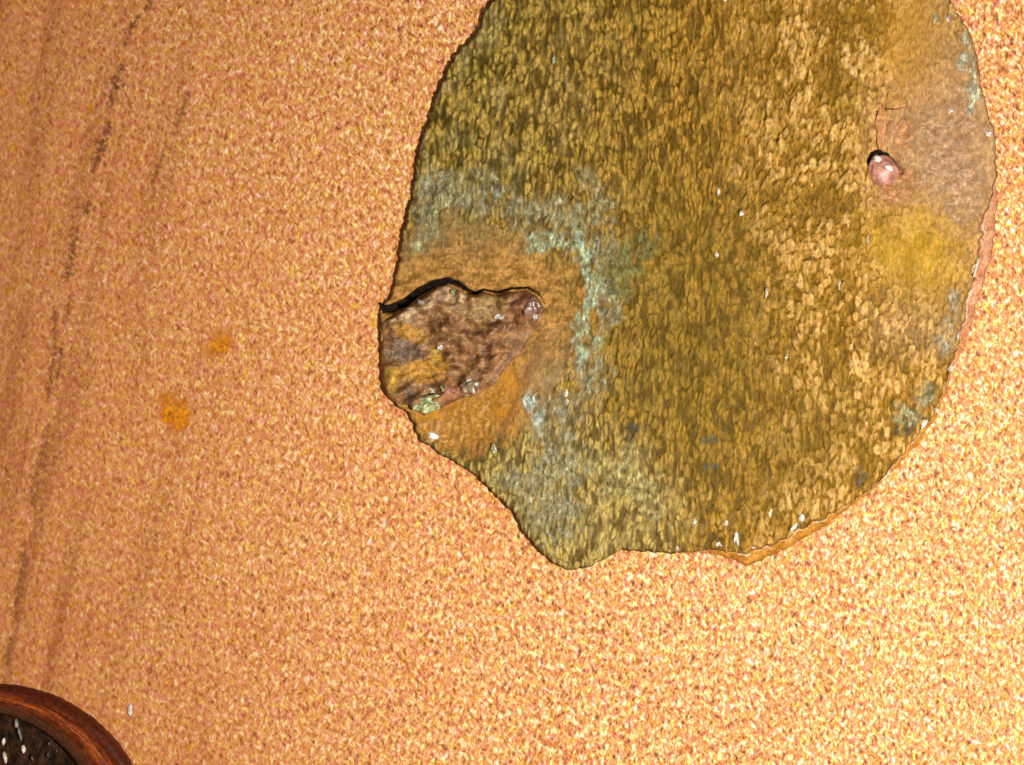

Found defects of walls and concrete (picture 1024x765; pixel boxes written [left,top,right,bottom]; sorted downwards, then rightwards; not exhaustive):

peeling [906,85,986,226]
crack [380,277,545,313]